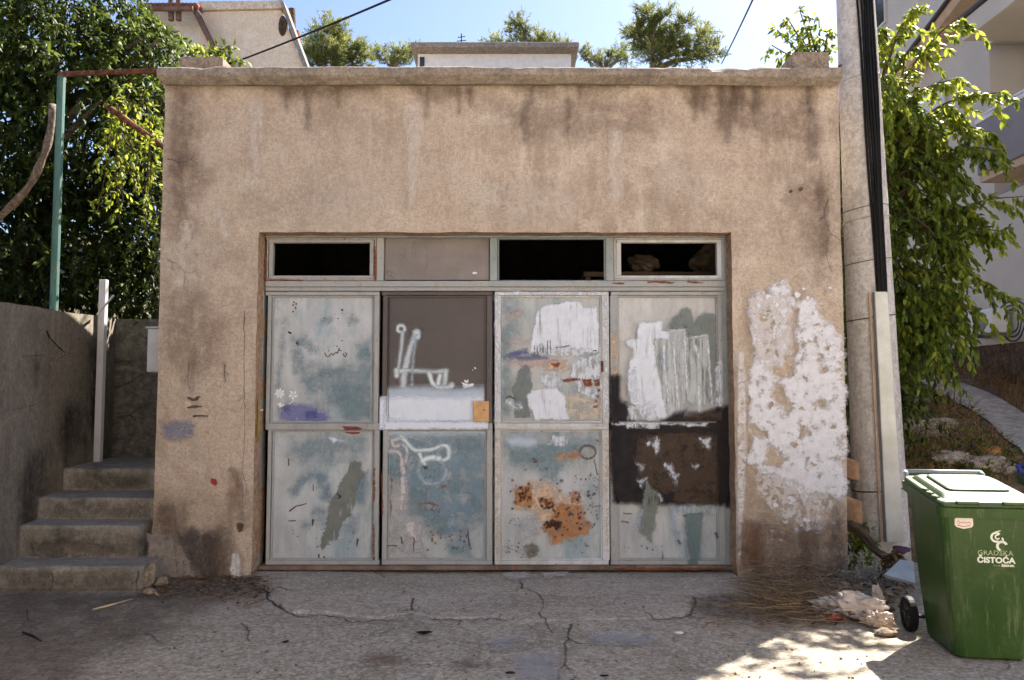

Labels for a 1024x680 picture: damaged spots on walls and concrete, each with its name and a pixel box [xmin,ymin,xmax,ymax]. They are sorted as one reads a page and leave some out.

peeling [746,280,848,541]
rust [510,479,596,544]
water stain [177,531,218,580]
crack [252,582,596,680]
crack [646,596,713,620]